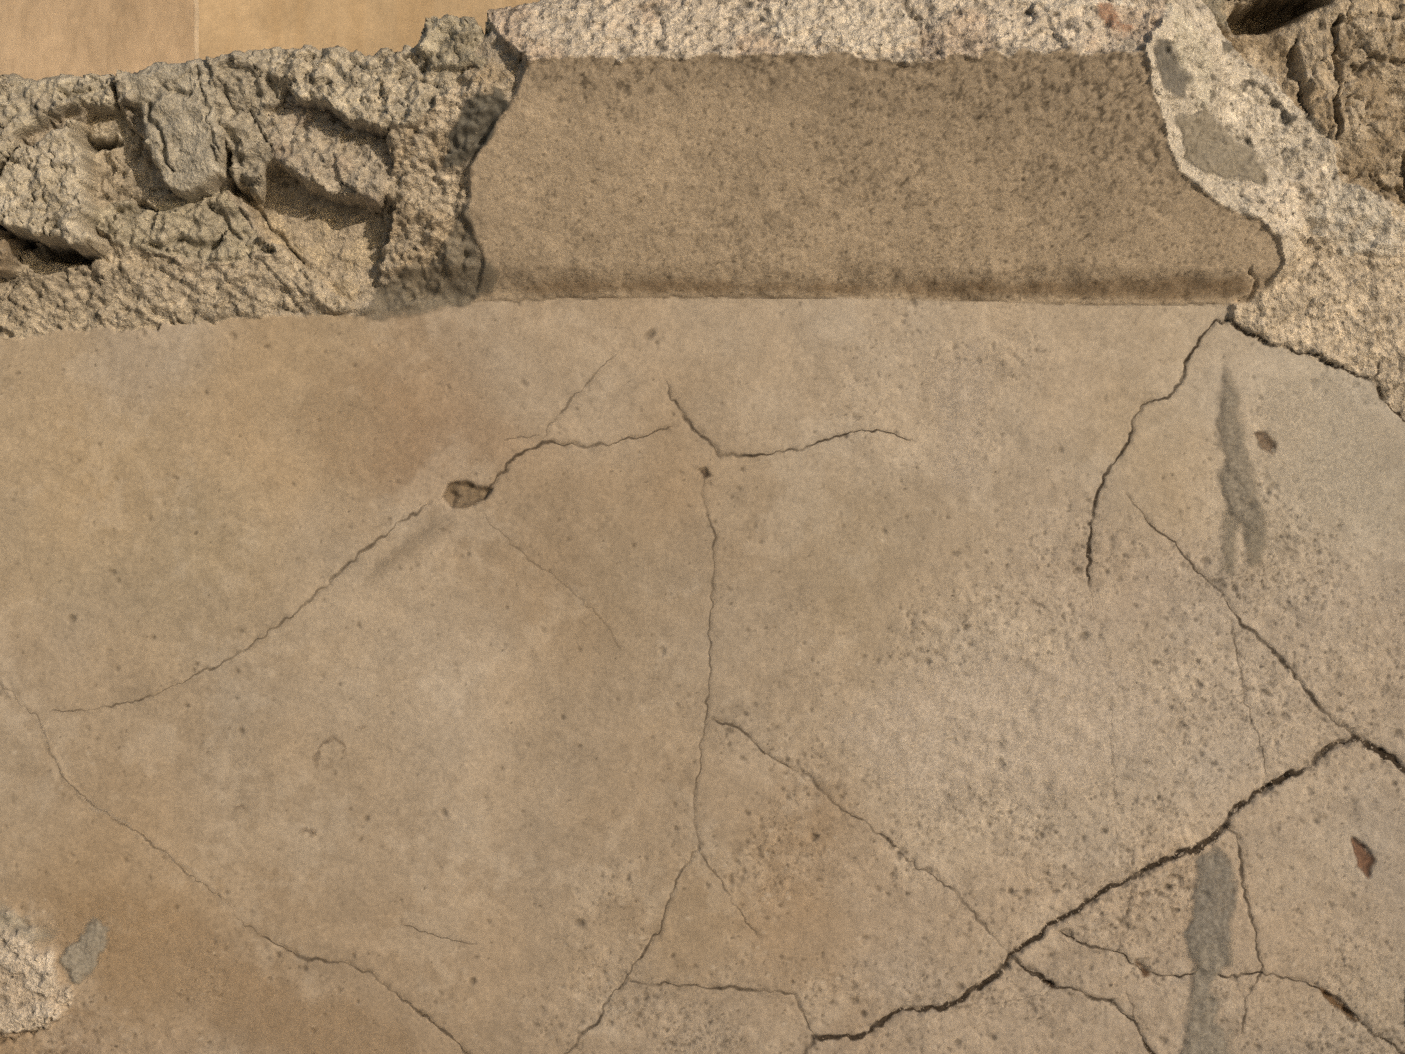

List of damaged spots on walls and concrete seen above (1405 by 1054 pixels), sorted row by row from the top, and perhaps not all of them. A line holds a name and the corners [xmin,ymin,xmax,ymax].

flaking render [487,0,1405,420]
crack [490,440,568,486]
crack [745,429,907,457]
crack [1086,319,1405,581]
crack [1145,518,1321,709]
flaking render [0,911,75,1036]
crack [806,737,1405,1054]